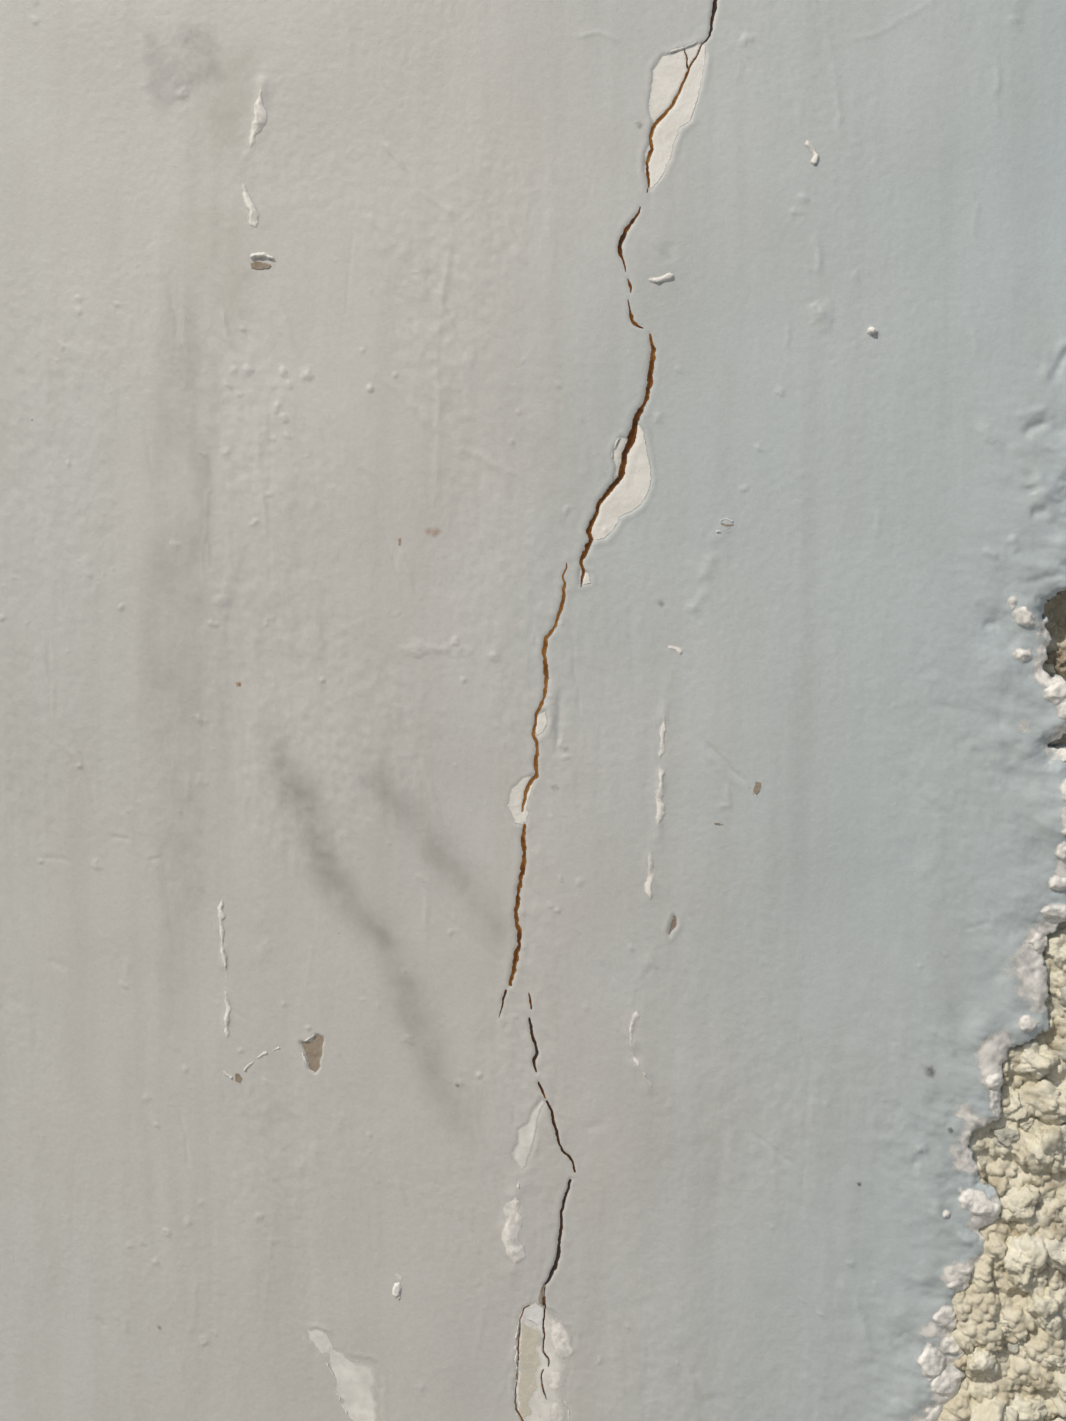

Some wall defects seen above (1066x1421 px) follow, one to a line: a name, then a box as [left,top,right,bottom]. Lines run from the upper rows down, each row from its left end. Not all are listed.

peeling [645,41,705,188]
peeling [591,425,651,540]
crack [499,0,717,1421]
flaking render [1008,590,1066,762]
peeling [300,1034,324,1072]
flaking render [910,779,1066,1421]
peeling [307,1329,377,1421]
peeling [513,1303,573,1421]